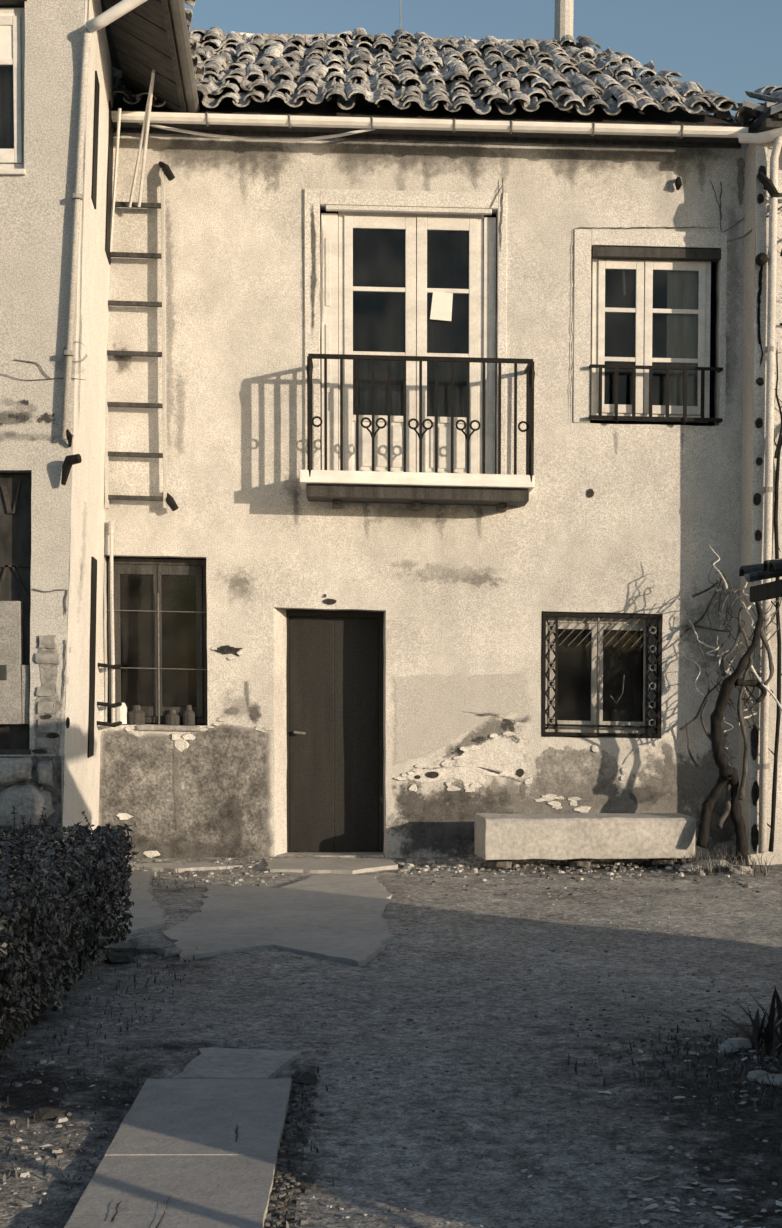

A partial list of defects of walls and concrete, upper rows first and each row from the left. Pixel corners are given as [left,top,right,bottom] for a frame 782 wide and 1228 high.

leakage [333,138,495,169]
leakage [547,144,710,170]
leakage [737,158,745,204]
leakage [446,717,519,756]
flaking render [394,731,628,813]
leakage [126,747,250,859]
leakage [388,734,736,857]